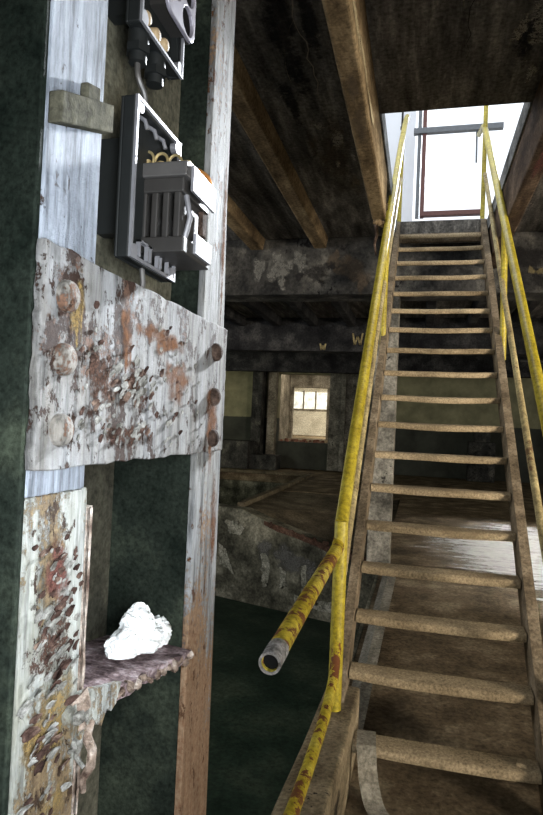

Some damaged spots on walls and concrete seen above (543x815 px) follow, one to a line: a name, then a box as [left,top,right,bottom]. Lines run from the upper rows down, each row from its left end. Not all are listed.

leakage [352,0,374,125]
leakage [253,251,307,291]
corrosion [71,282,84,348]
corrosion [122,310,177,381]
corrosion [207,392,217,464]